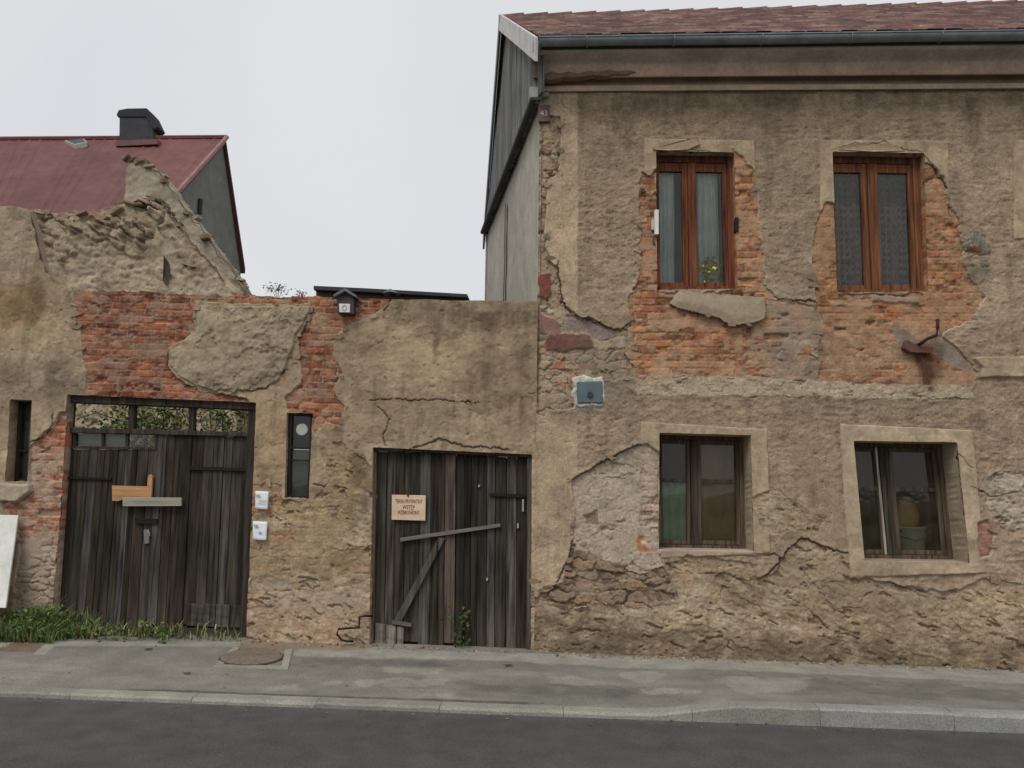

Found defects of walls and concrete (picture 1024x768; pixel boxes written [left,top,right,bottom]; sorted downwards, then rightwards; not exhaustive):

spalling [537,117,985,416]
spalling [3,412,67,621]
spalling [33,152,390,596]
crack [371,398,478,441]
crack [416,438,509,450]
spalling [528,444,1024,670]
crack [687,538,867,653]
crack [889,582,985,644]
crack [958,453,1023,497]